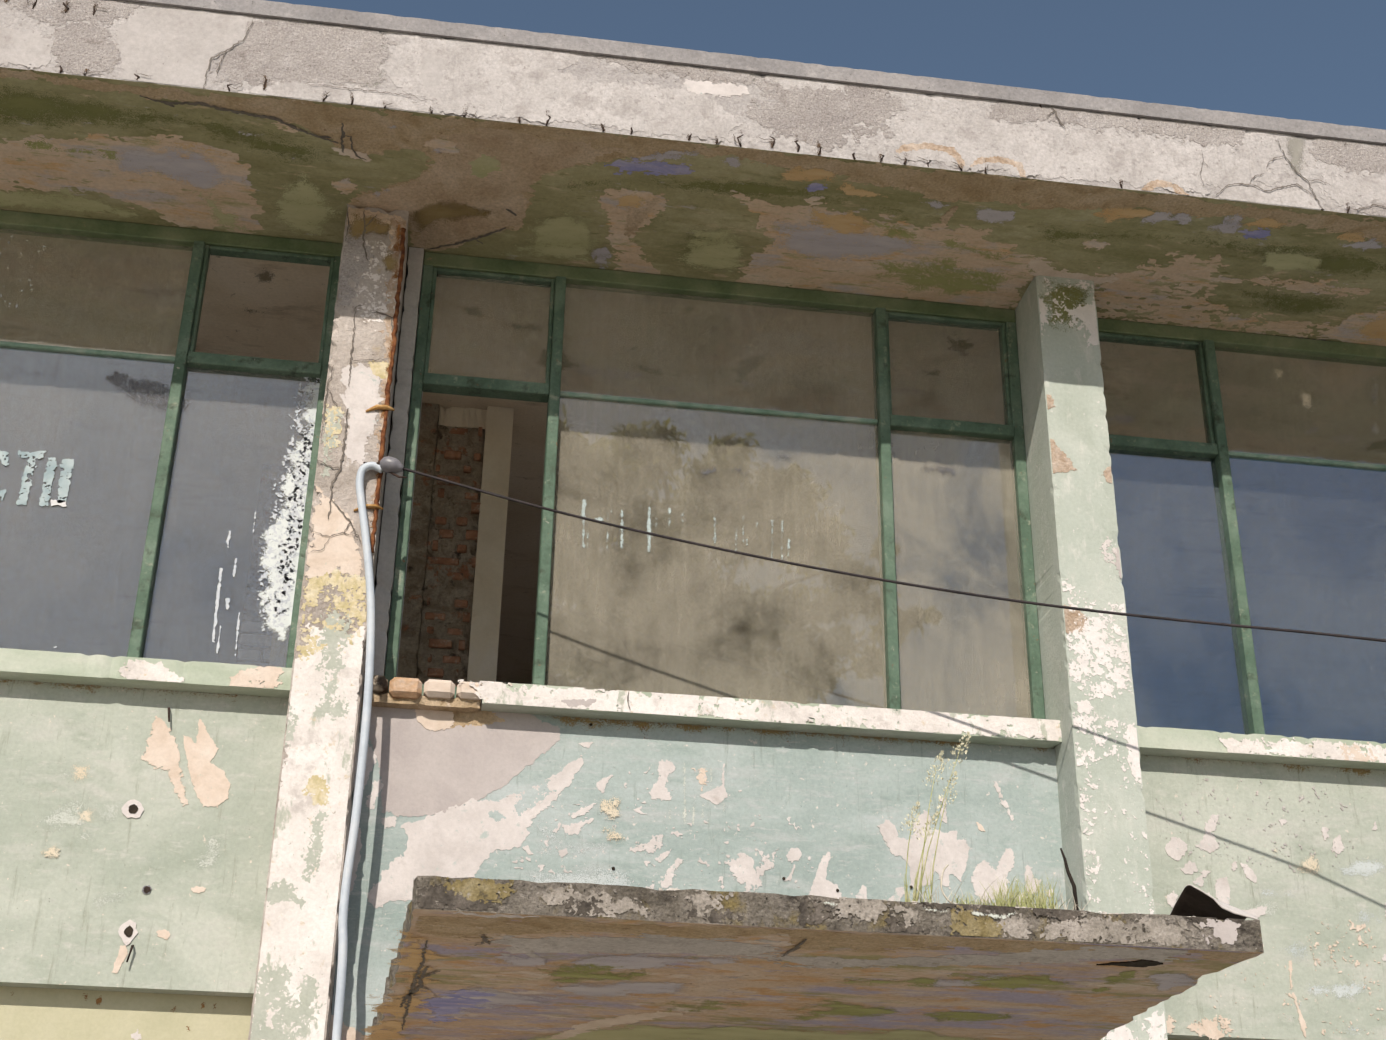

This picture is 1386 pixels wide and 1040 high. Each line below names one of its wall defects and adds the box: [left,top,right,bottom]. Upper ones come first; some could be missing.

crack [140,21,425,160]
crack [1200,141,1332,210]
spalling [0,0,1386,477]
spalling [1103,466,1112,483]
peeling [118,659,185,683]
peeling [141,716,231,808]
peeling [229,471,1268,1040]
peeling [1216,736,1386,763]
spalling [121,799,144,818]
peeling [1156,772,1358,924]
peeling [1282,920,1386,1038]